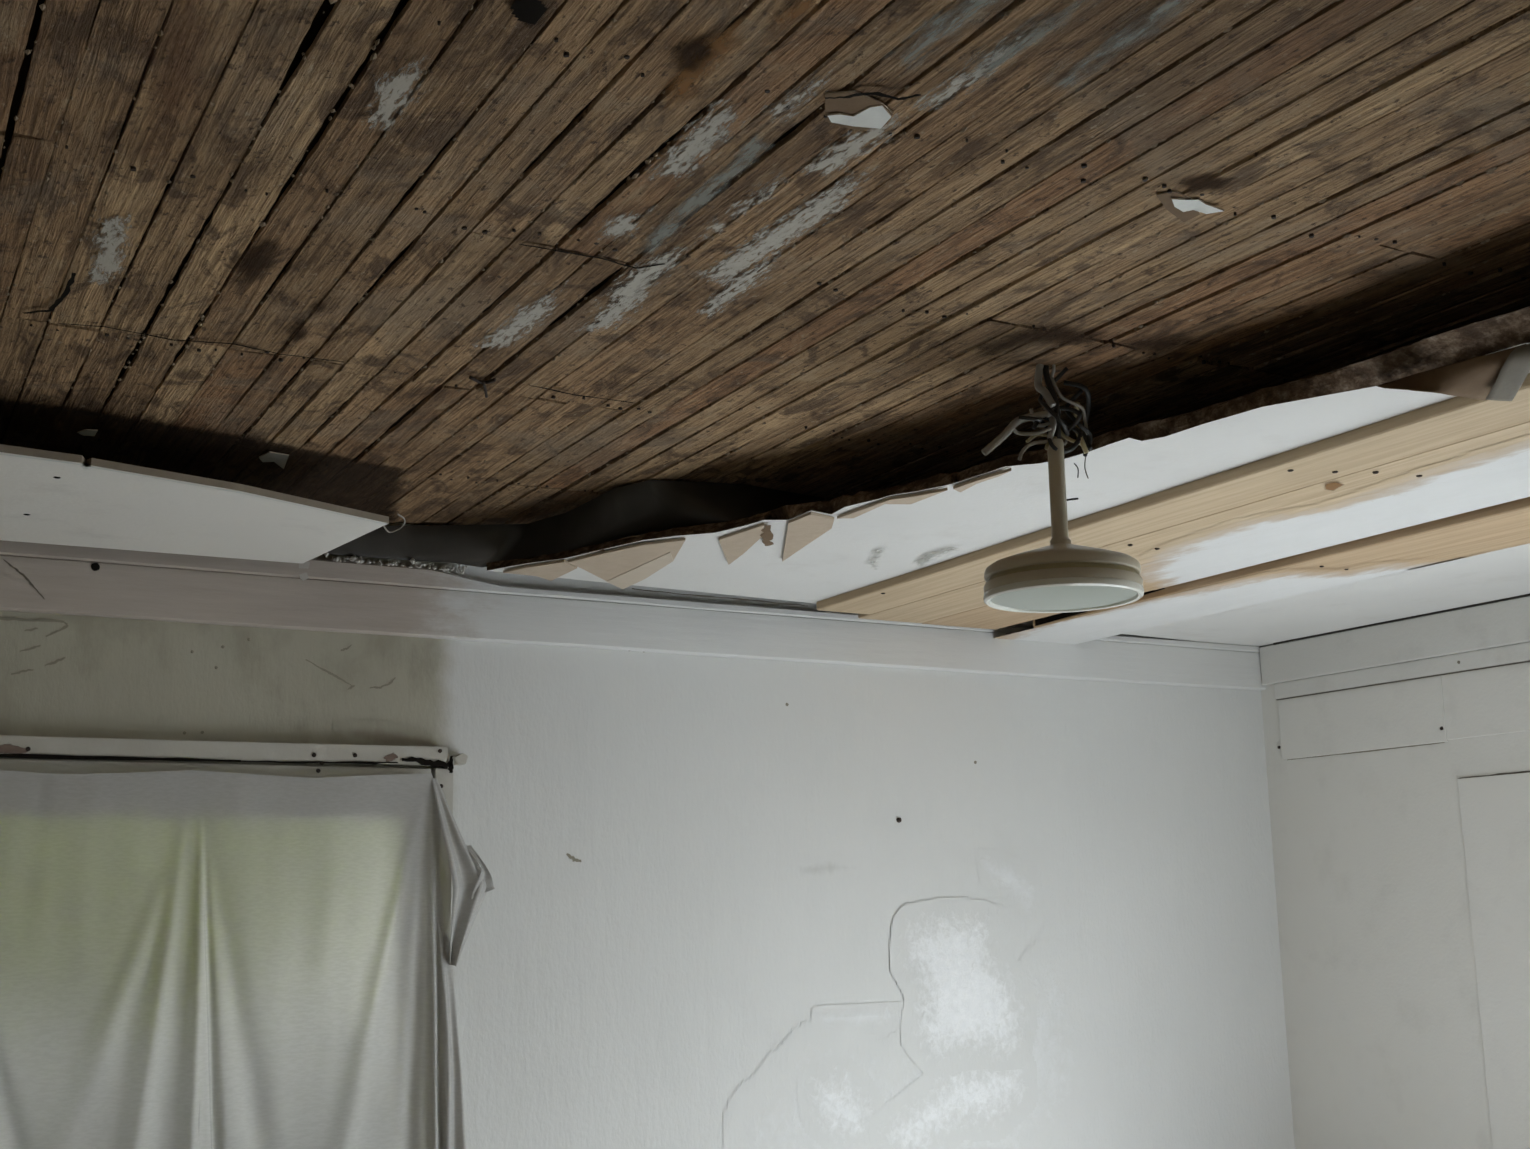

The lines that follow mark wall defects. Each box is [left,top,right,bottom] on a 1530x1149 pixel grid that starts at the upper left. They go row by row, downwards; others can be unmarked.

leakage [676,41,710,71]
spalling [486,307,1530,571]